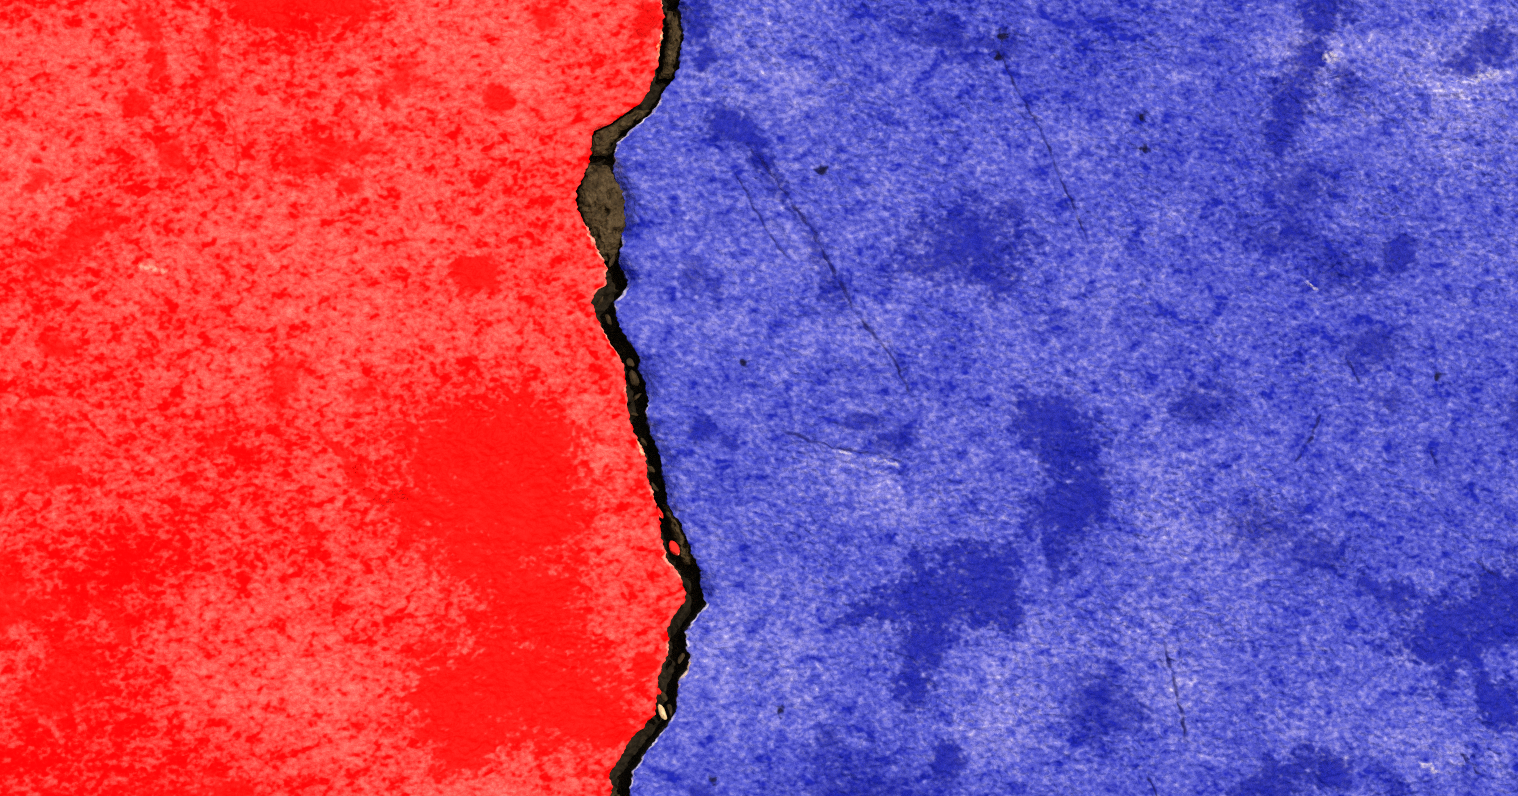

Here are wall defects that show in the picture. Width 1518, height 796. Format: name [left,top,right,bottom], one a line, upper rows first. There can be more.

crack [569,0,708,796]